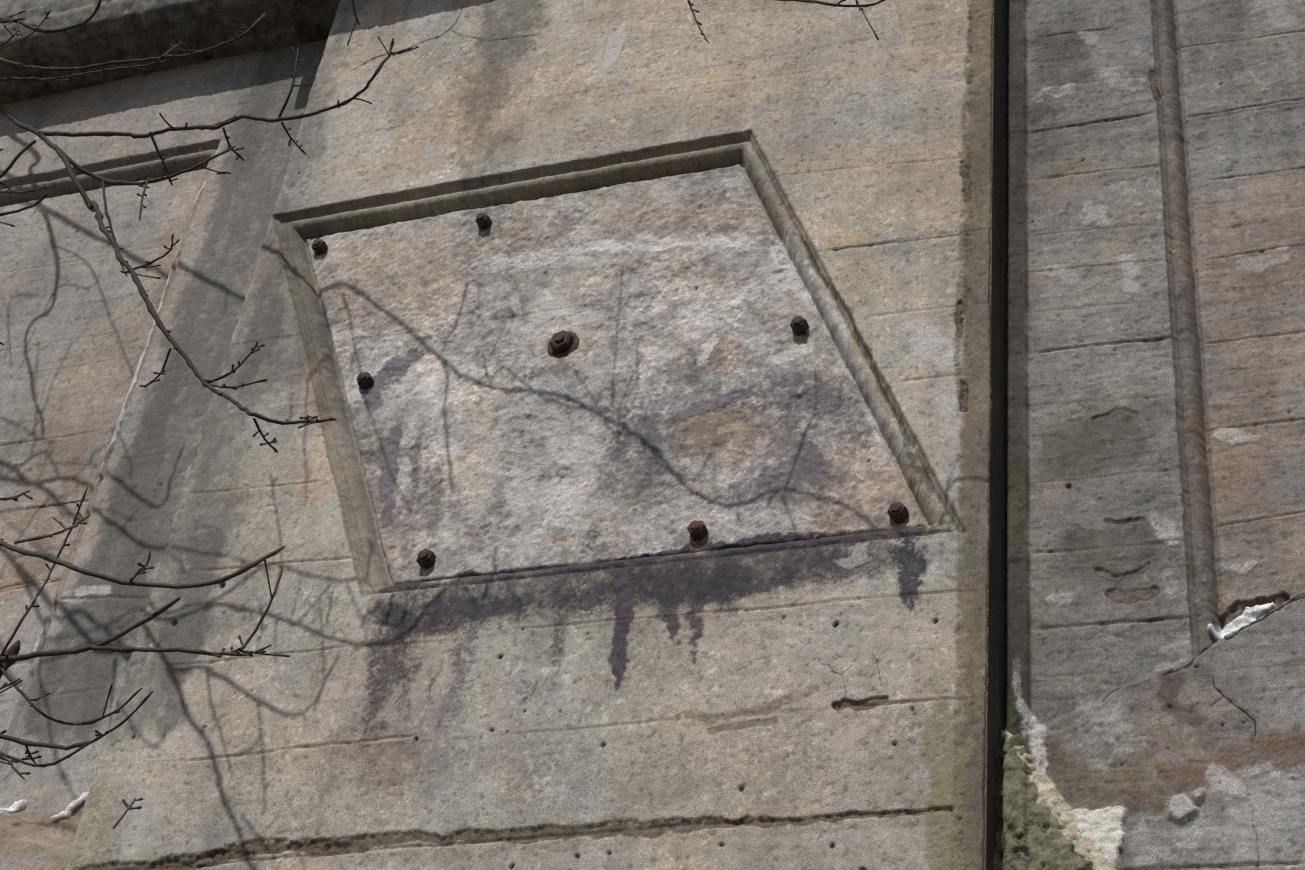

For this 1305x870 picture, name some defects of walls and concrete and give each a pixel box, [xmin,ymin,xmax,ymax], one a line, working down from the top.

leakage [27,8,346,740]
leakage [332,308,424,410]
leakage [899,316,960,437]
leakage [363,232,949,731]
crack [1164,595,1305,751]
spalling [1213,594,1289,644]
crack [1251,807,1259,870]